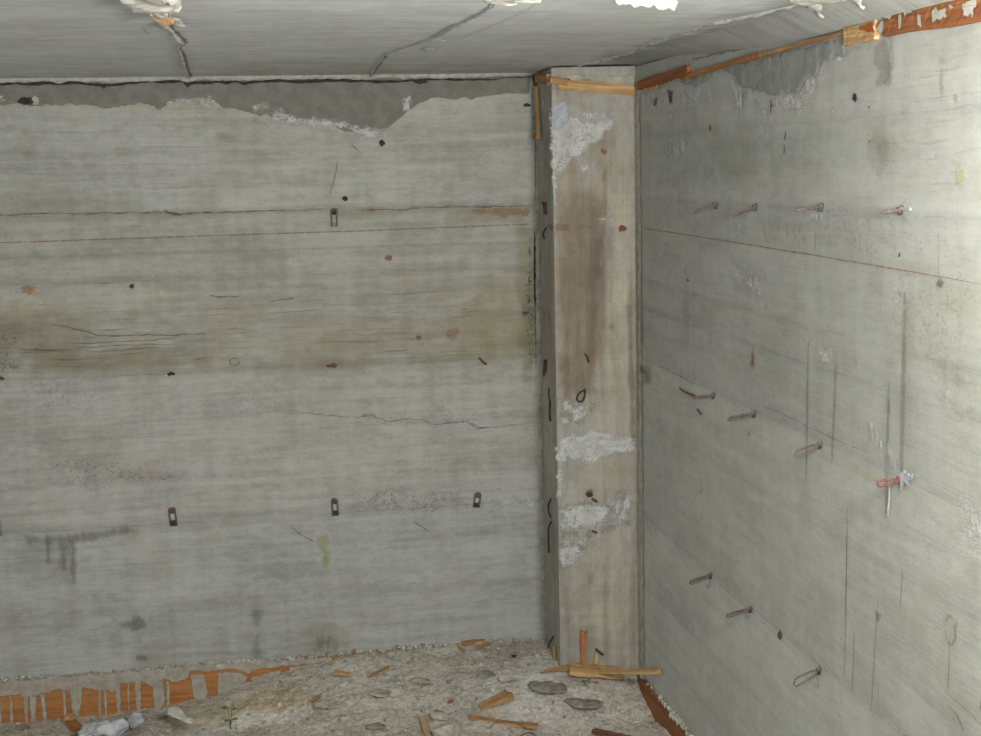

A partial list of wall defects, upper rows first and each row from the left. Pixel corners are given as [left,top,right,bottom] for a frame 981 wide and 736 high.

spalling [119,0,185,27]
spalling [18,96,39,105]
peeling [253,102,385,146]
spalling [559,489,633,569]